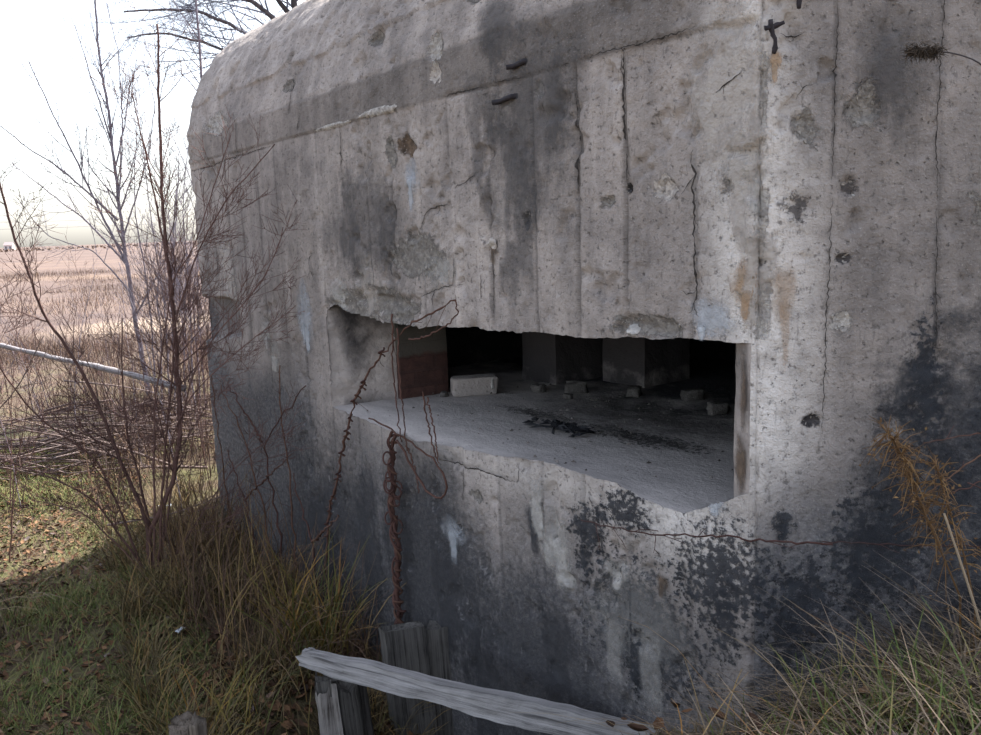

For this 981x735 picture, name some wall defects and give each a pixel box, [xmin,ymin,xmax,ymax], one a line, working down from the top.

spalling [385,133,417,168]
crack [584,26,695,192]
crack [681,150,699,317]
crack [796,7,839,432]
crack [932,0,945,362]
leakage [842,356,963,634]